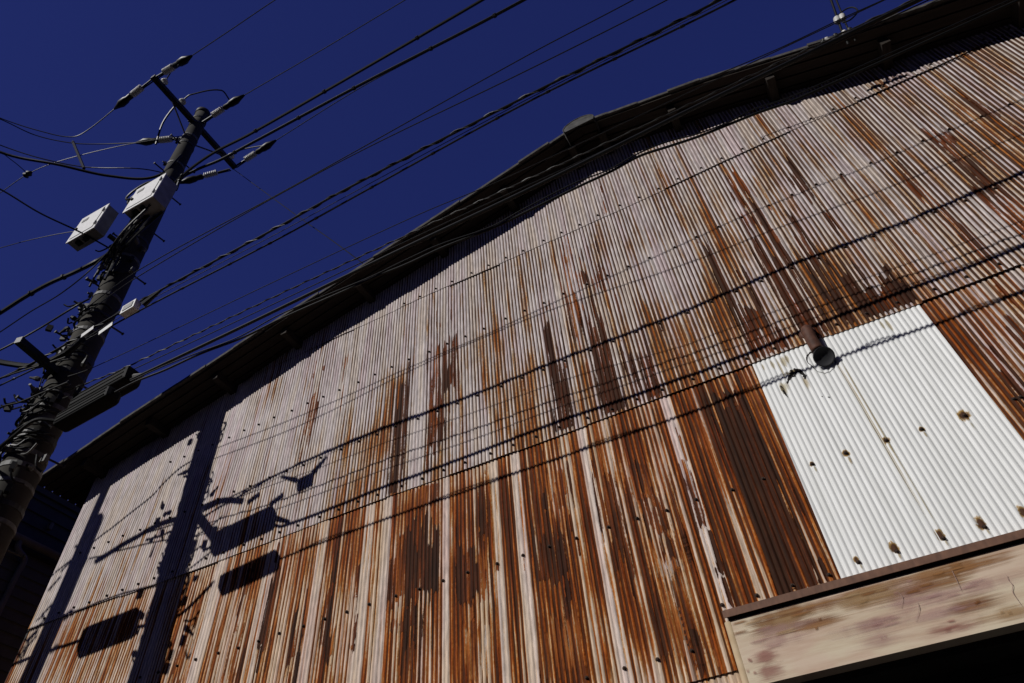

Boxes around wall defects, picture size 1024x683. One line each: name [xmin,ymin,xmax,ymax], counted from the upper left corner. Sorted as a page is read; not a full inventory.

rust [877,146,1024,349]
rust [913,111,1024,239]
rust [168,565,215,683]
rust [203,541,283,683]
rust [283,588,308,683]
rust [318,550,361,683]
rust [385,304,463,683]
rust [453,464,499,683]
rust [523,443,591,683]
rust [540,236,741,681]
rust [696,156,919,595]
rust [735,553,1007,634]